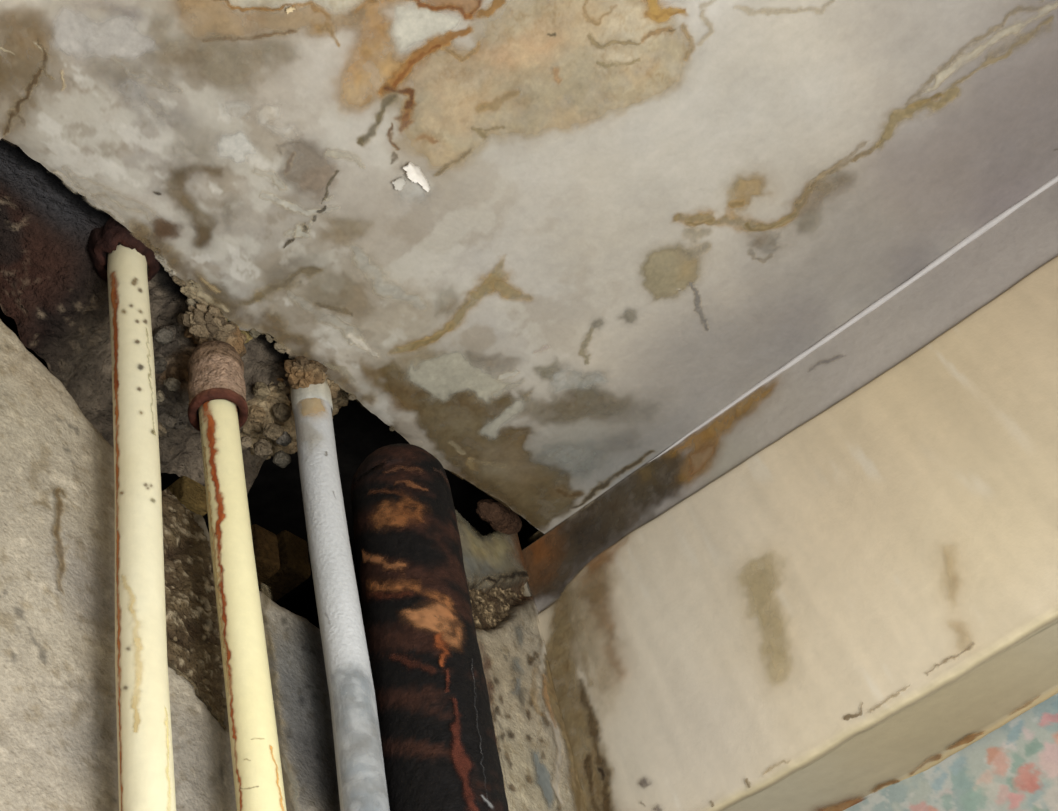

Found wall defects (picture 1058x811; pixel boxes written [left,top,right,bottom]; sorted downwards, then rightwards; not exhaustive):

crack [3,40,54,136]
damp [0,0,359,131]
damp [168,166,221,248]
damp [225,103,364,235]
peeling [392,162,430,200]
damp [642,3,1058,330]
spalling [0,138,410,730]
peeling [409,352,521,401]
corrosion [669,384,775,482]
damp [244,262,686,811]
spalling [444,469,562,631]
peeling [482,641,564,811]